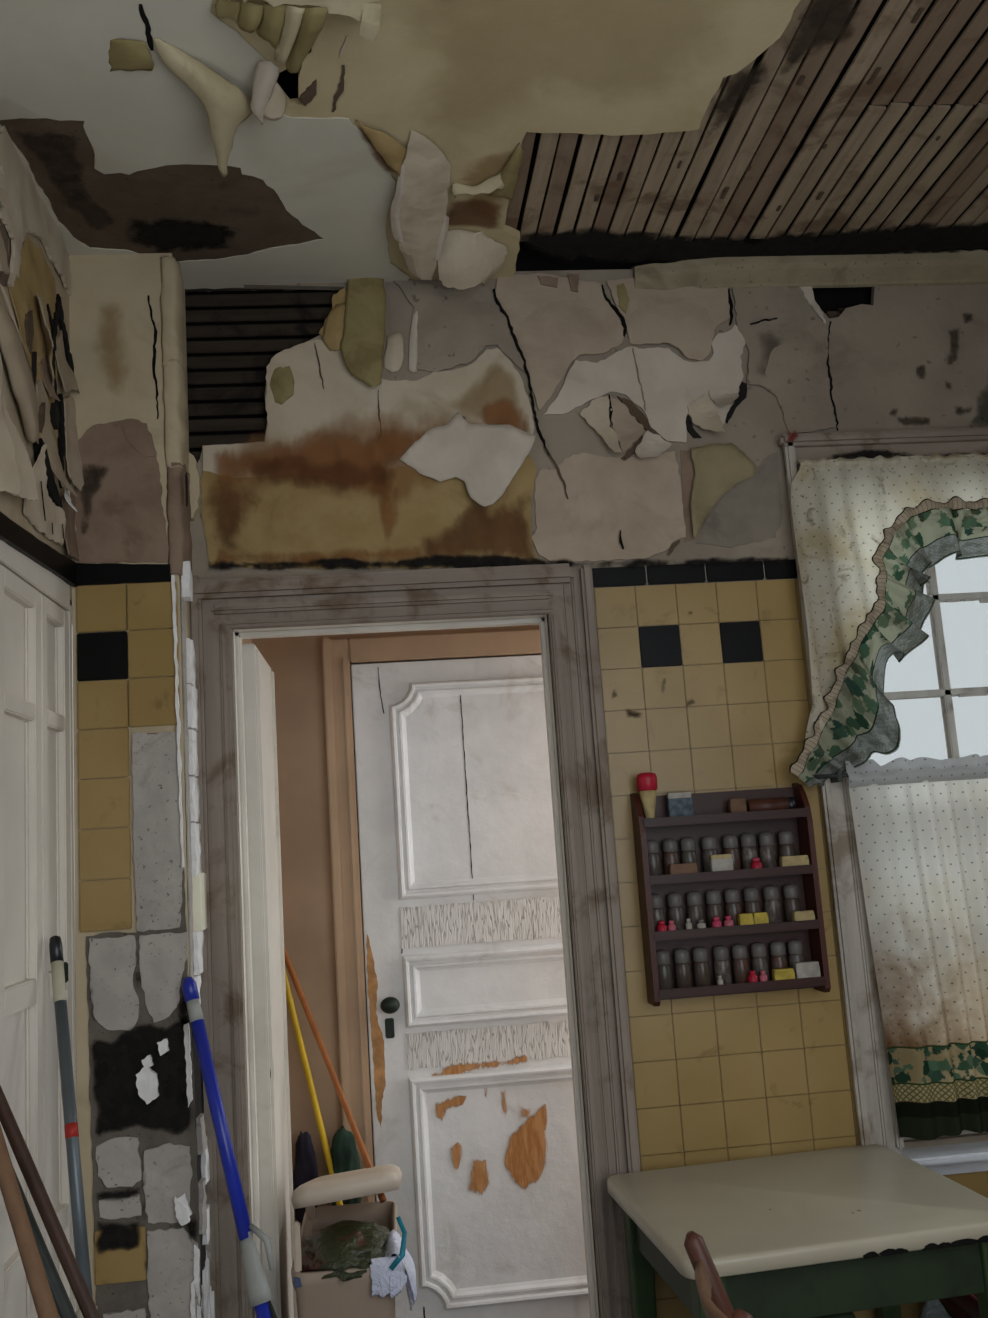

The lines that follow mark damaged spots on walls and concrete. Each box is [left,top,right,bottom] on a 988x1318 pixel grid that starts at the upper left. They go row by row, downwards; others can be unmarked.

crack [601,284,627,337]
crack [728,288,777,326]
crack [493,289,550,456]
crack [826,321,839,431]
spalling [0,0,782,1318]